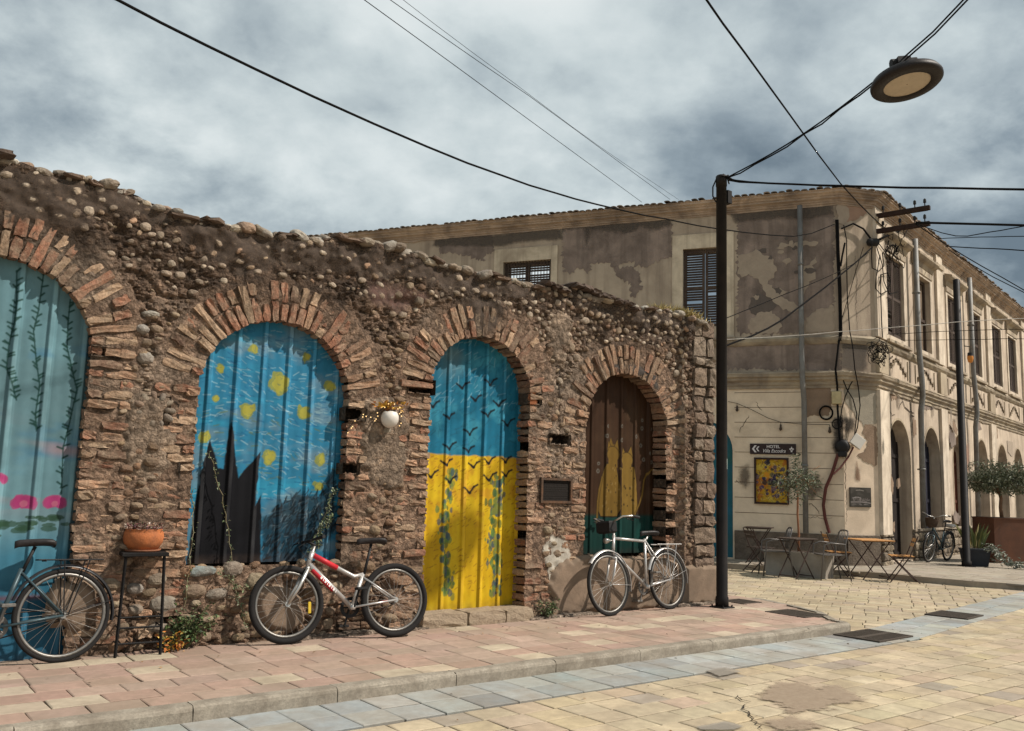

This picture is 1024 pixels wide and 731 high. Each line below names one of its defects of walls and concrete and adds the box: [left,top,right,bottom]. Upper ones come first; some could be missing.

flaking render [439,235,495,261]
flaking render [560,222,674,298]
flaking render [727,203,867,371]